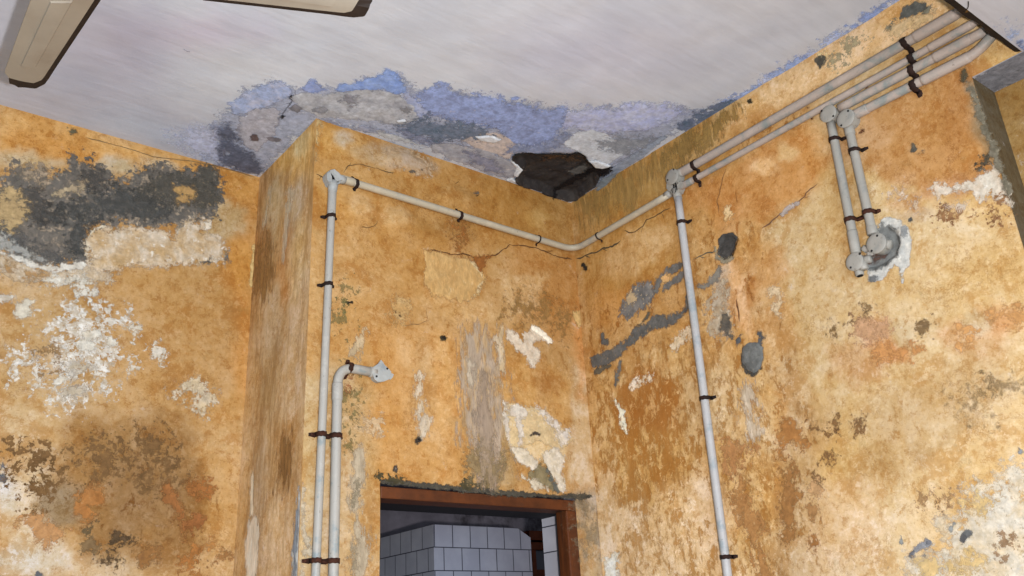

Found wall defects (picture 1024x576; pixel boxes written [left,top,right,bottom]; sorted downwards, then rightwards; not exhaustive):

peeling [164,68,703,202]
peeling [866,68,1017,284]
water stain [0,122,262,517]
water stain [251,220,277,306]
peeling [424,249,487,304]
water stain [454,284,573,494]
peeling [506,325,553,368]
crack [432,207,671,259]
peeling [590,261,689,387]
water stain [272,424,293,499]
peeling [501,400,574,493]
water stain [79,515,136,573]